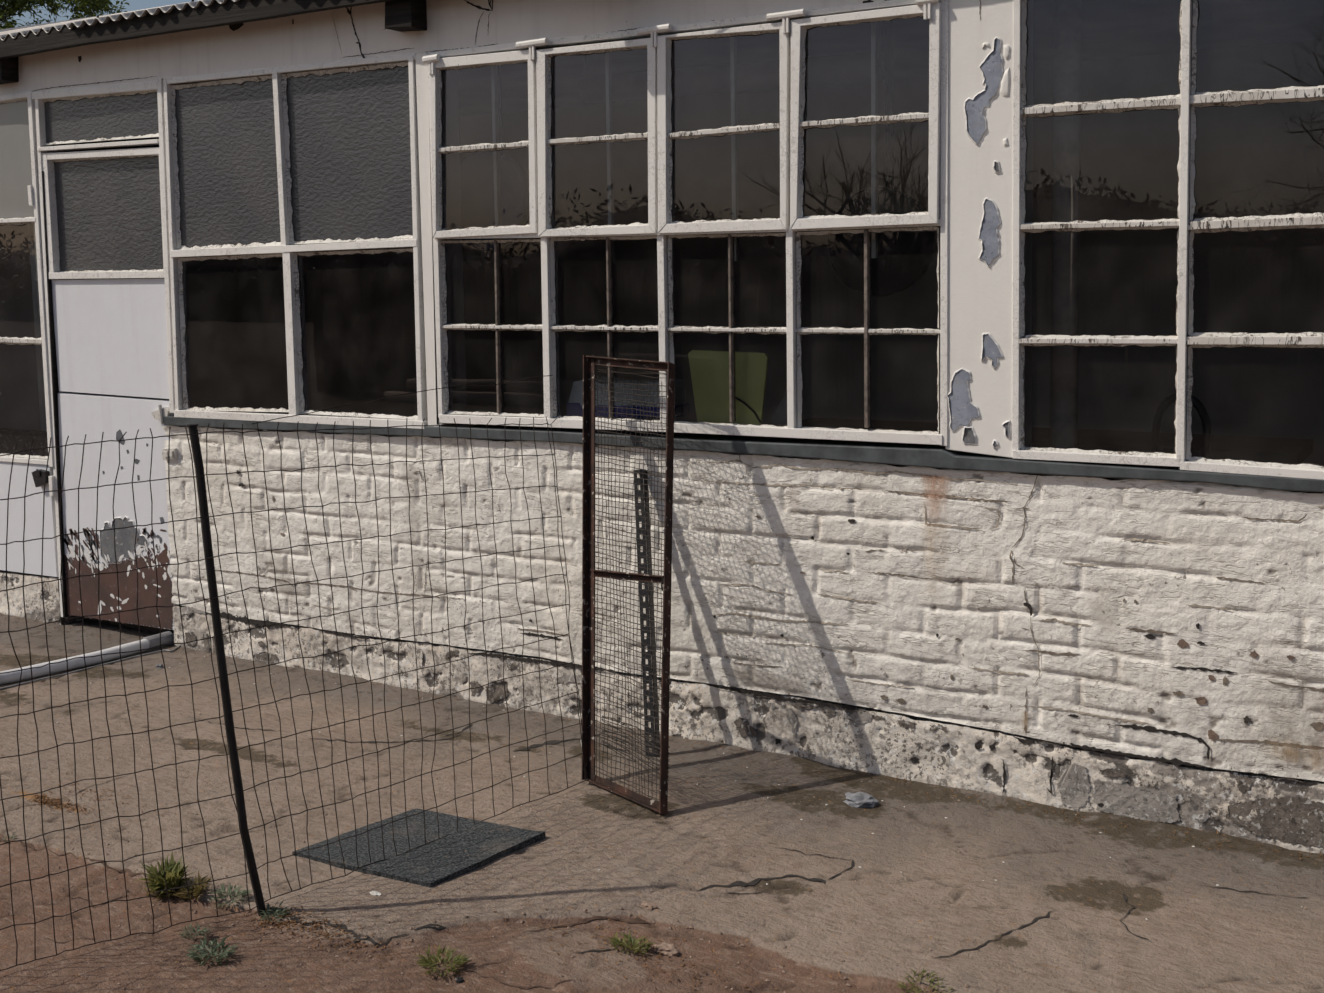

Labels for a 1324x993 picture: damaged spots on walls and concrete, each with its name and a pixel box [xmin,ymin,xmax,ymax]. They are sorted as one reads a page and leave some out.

peeling [964,36,1005,146]
peeling [978,197,1002,268]
peeling [947,332,1011,449]
peeling [64,516,216,657]
crack [699,454,1324,759]
crack [1001,760,1009,792]
crack [1046,756,1054,794]
spalling [1057,763,1180,823]
spalling [1228,776,1324,849]
crack [697,847,854,894]
crack [932,910,1055,959]
crack [1120,893,1151,942]